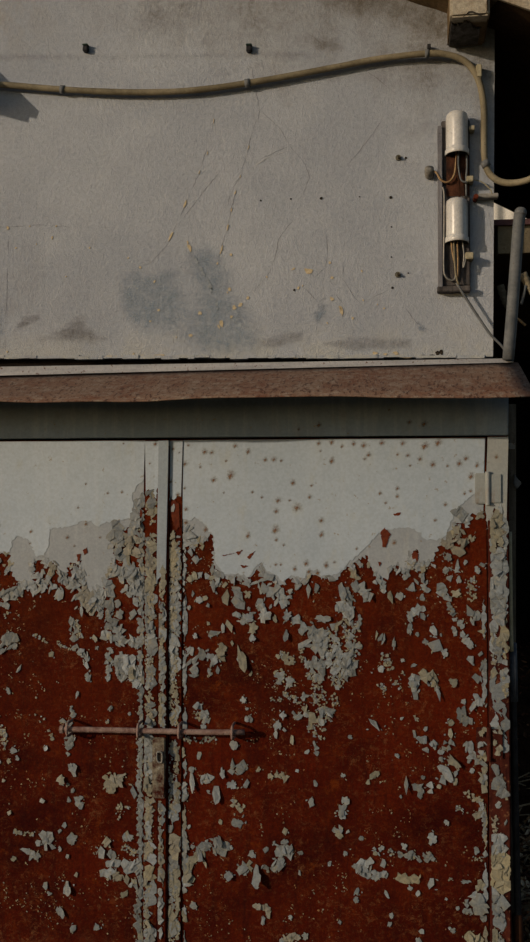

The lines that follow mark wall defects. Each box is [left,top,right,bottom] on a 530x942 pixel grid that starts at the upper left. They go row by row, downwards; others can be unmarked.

rust [169,488,188,529]
rust [380,528,395,547]
peeling [0,489,511,942]